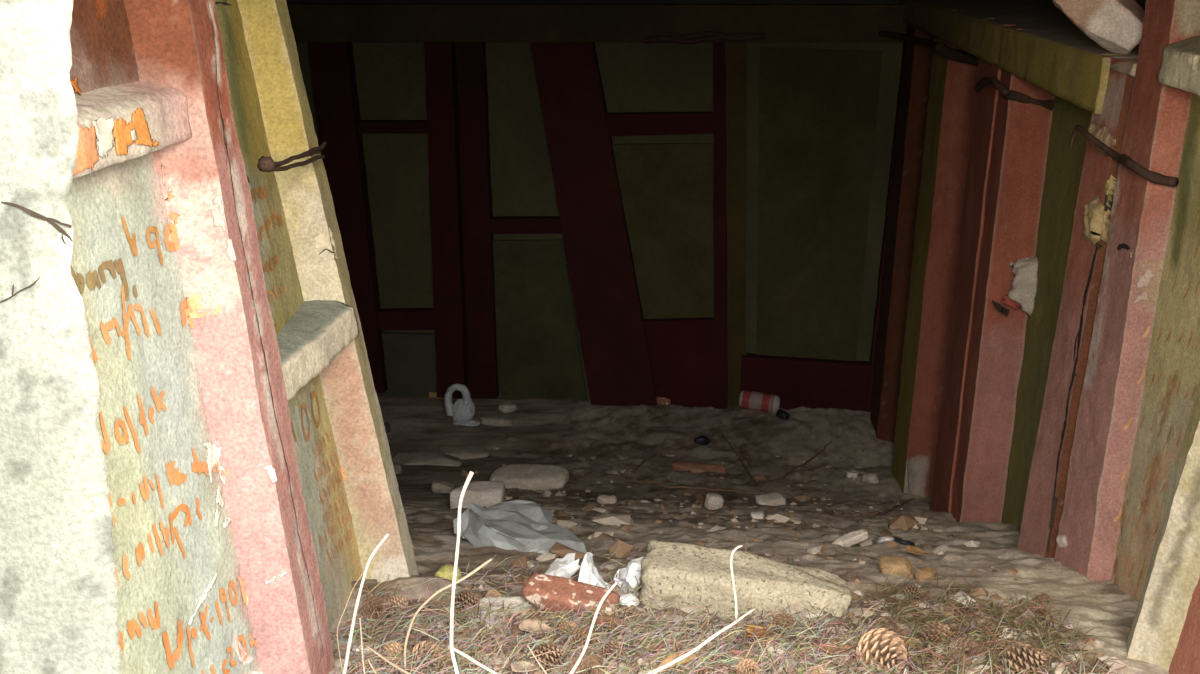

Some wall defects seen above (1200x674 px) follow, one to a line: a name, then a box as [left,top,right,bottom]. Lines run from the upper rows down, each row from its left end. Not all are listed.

peeling [73,108,159,176]
damp [1173,107,1198,262]
crack [1047,190,1113,552]